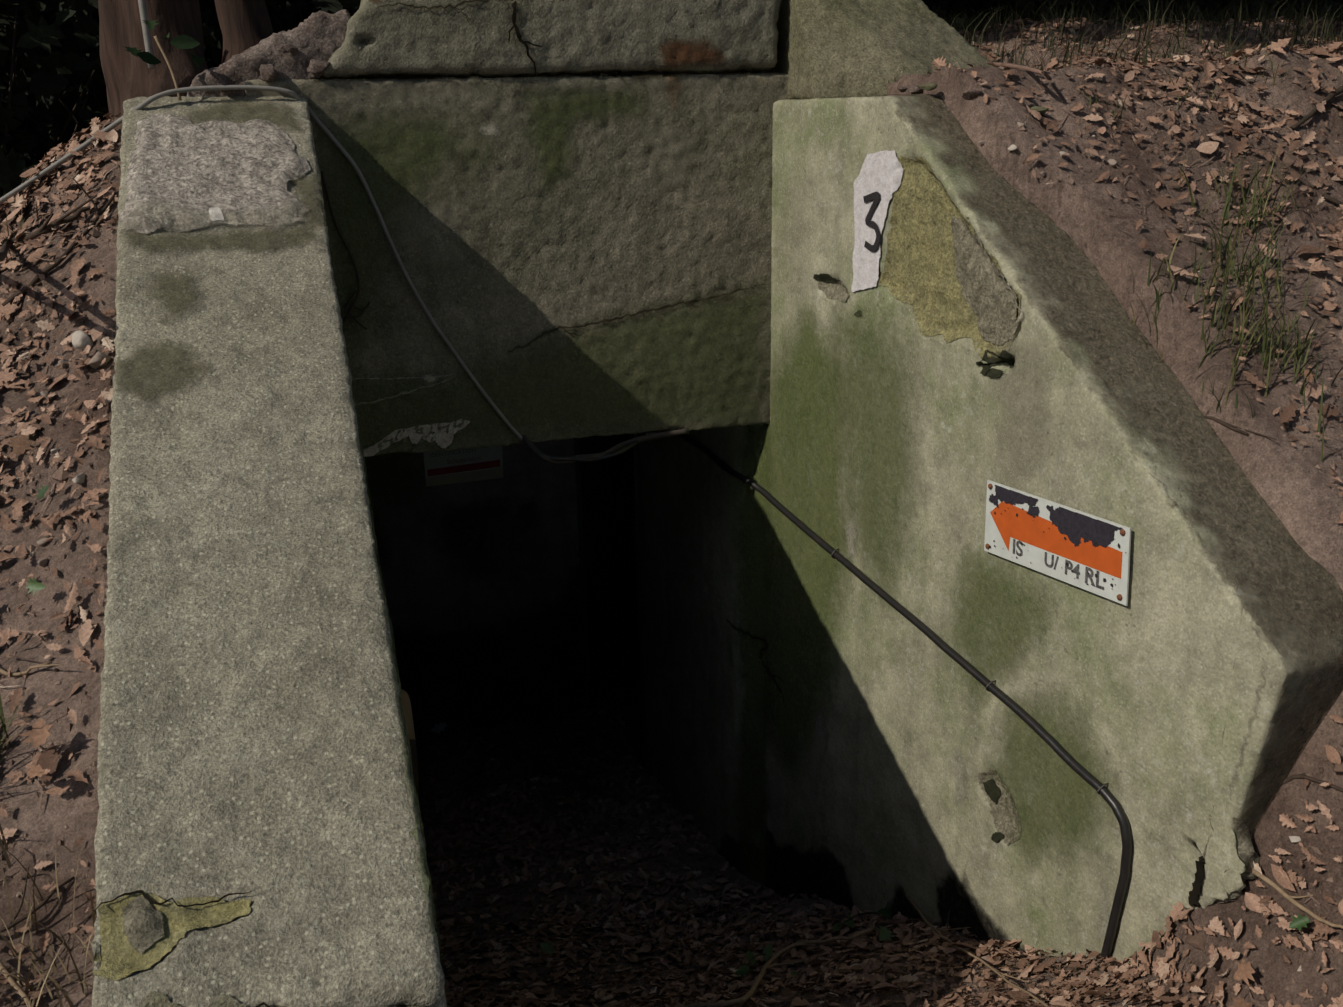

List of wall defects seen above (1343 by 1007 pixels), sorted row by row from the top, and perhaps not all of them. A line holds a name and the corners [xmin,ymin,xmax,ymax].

crack [310,0,779,80]
corrosion [661,40,724,90]
spalling [878,156,1022,378]
crack [508,284,768,352]
peeling [361,419,470,457]
peeling [977,769,1021,846]
damp [717,831,854,911]
spalling [92,888,261,981]
damp [936,874,1026,953]